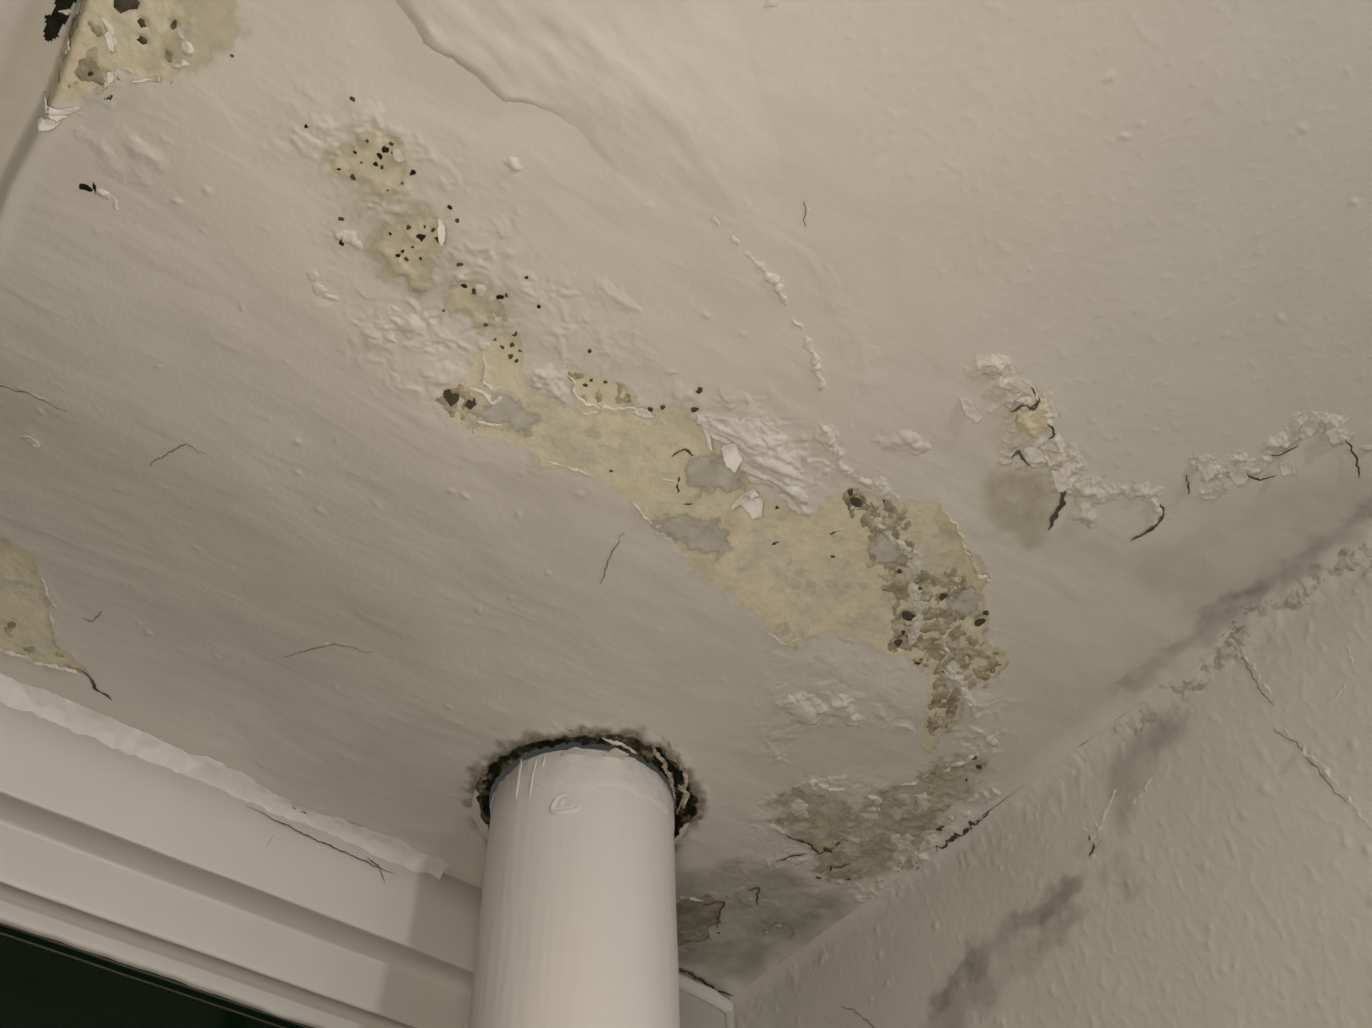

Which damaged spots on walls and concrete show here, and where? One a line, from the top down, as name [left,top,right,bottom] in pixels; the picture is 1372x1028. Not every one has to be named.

peeling [36,0,239,132]
peeling [326,130,416,202]
peeling [334,203,459,294]
spalling [711,216,826,393]
peeling [959,350,1165,541]
peeling [1183,404,1372,505]
peeling [0,537,112,701]
peeling [435,263,1009,881]
peeling [676,895,725,945]